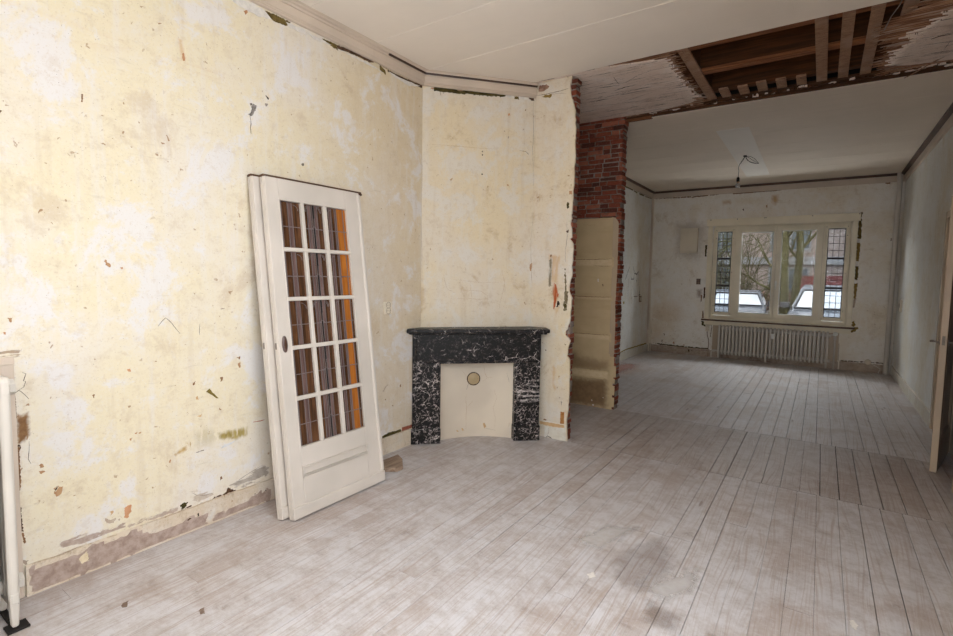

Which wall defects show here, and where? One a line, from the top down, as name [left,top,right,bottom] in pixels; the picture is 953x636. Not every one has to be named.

flaking render [232,0,423,89]
peeling [0,316,28,363]
flaking render [18,446,29,546]
flaking render [23,457,274,597]